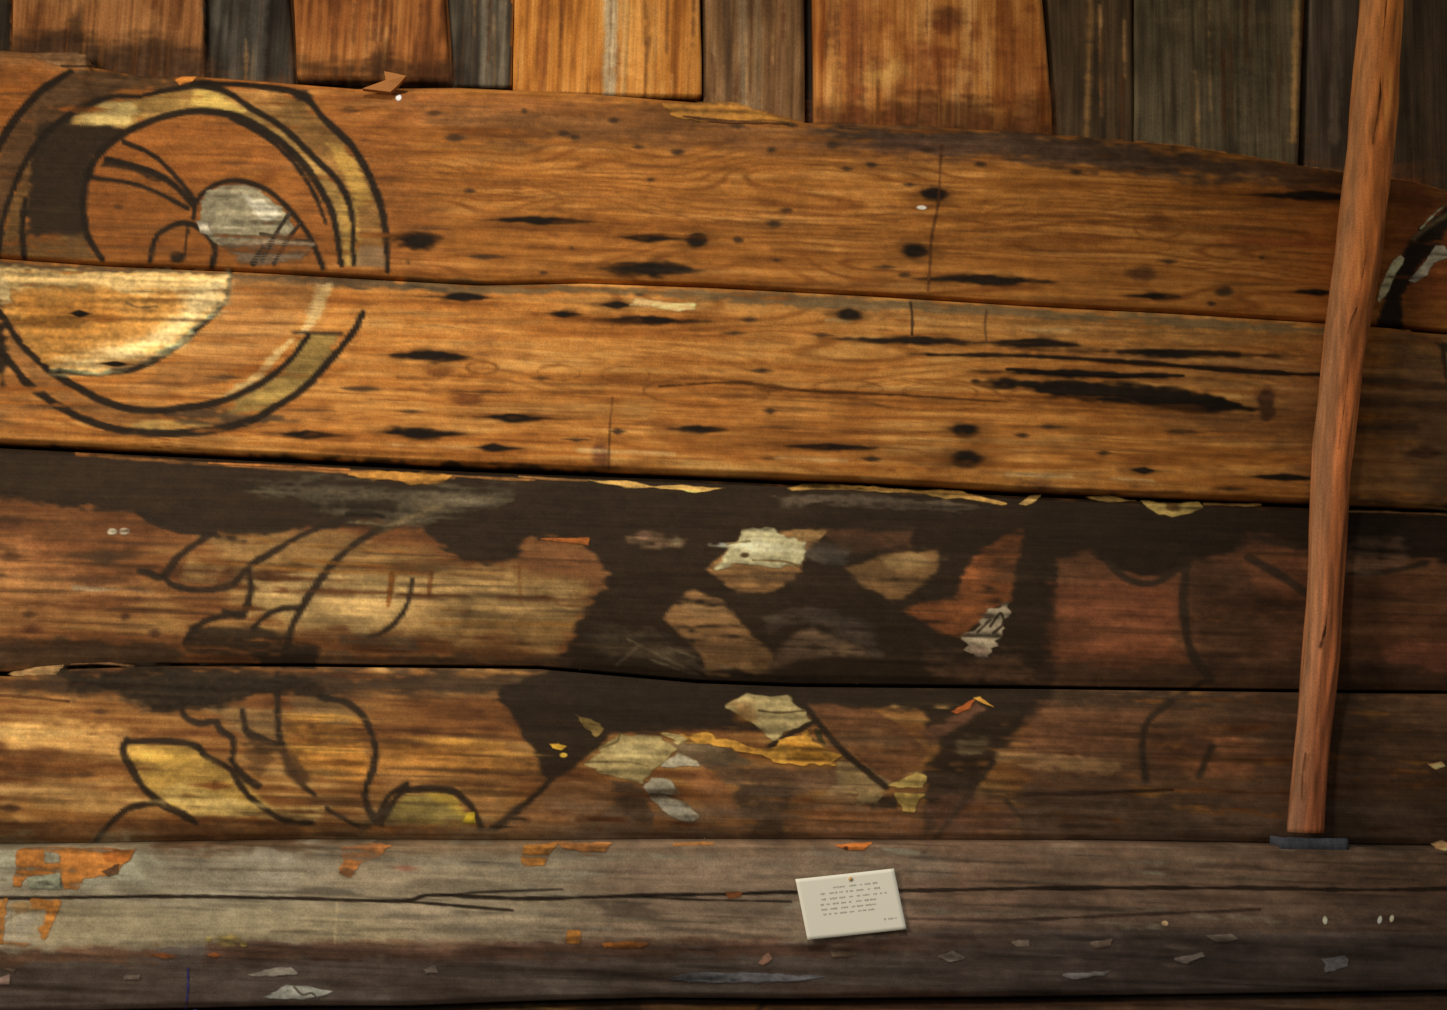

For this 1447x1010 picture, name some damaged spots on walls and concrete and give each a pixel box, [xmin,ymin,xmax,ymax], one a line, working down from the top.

spalling [1378,245,1447,302]
peeling [715,529,826,570]
peeling [962,605,1011,657]
spalling [952,697,992,714]
peeling [578,693,841,822]
peeling [856,773,927,812]
peeling [0,847,134,945]
crack [0,888,798,911]
crack [898,885,1447,921]